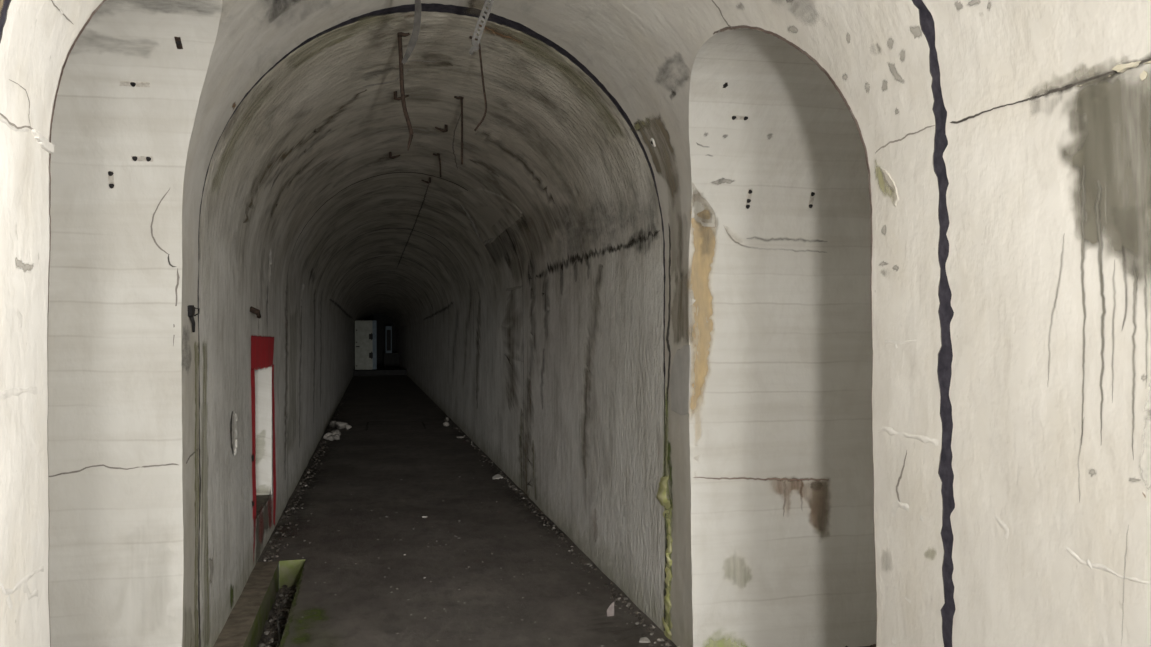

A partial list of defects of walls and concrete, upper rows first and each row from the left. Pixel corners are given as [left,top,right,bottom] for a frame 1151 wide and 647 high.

crack [0,81,55,154]
peeling [866,39,905,91]
crack [875,55,1151,153]
water stain [713,25,872,329]
water stain [678,275,688,341]
water stain [1062,73,1151,460]
crack [48,449,201,647]
water stain [656,443,673,640]
rust [693,477,829,537]